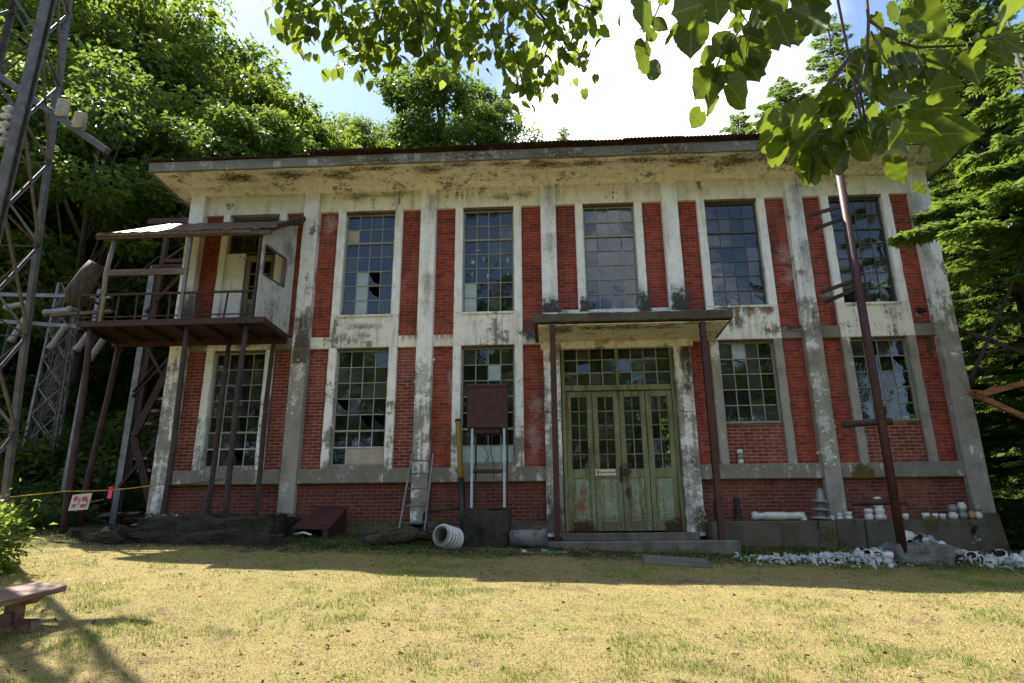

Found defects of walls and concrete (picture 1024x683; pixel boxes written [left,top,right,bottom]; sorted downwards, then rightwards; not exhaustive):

water stain [638,285,652,311]
water stain [670,283,691,310]
water stain [292,316,311,363]
rust [573,487,594,532]